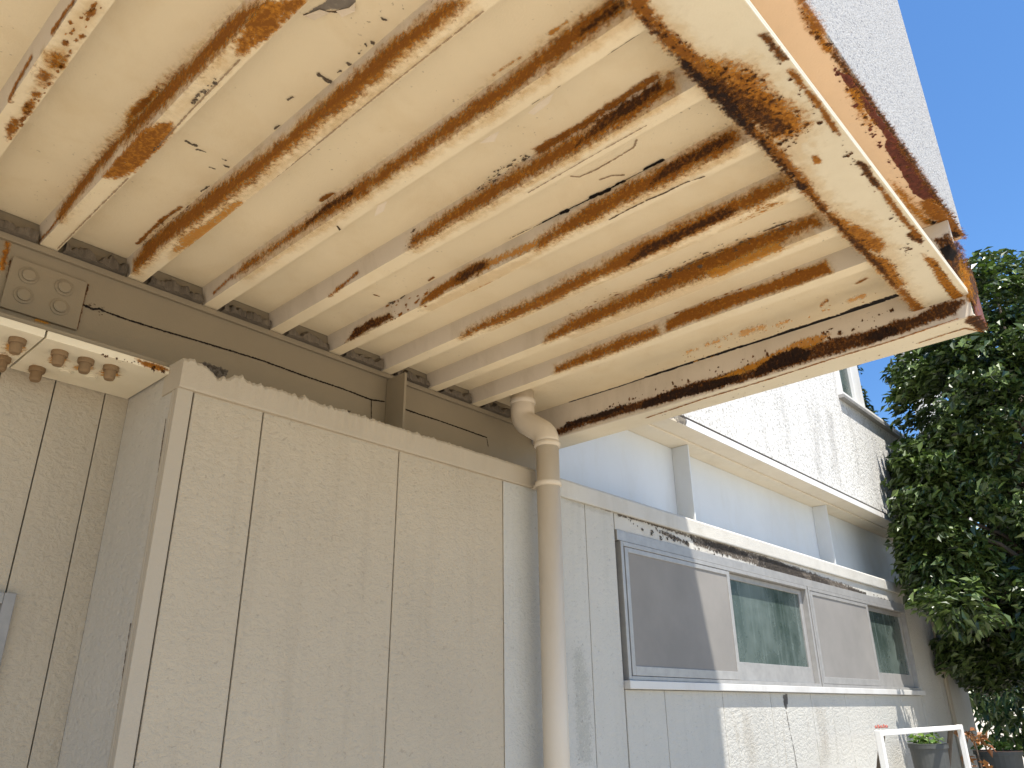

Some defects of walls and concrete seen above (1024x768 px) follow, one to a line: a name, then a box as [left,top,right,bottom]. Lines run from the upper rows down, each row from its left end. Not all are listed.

rust [5,0,102,140]
rust [39,0,306,249]
rust [133,0,484,272]
peeling [303,0,356,20]
crack [513,159,665,237]
rust [213,0,988,435]
spalling [202,362,228,378]
crack [84,304,488,443]